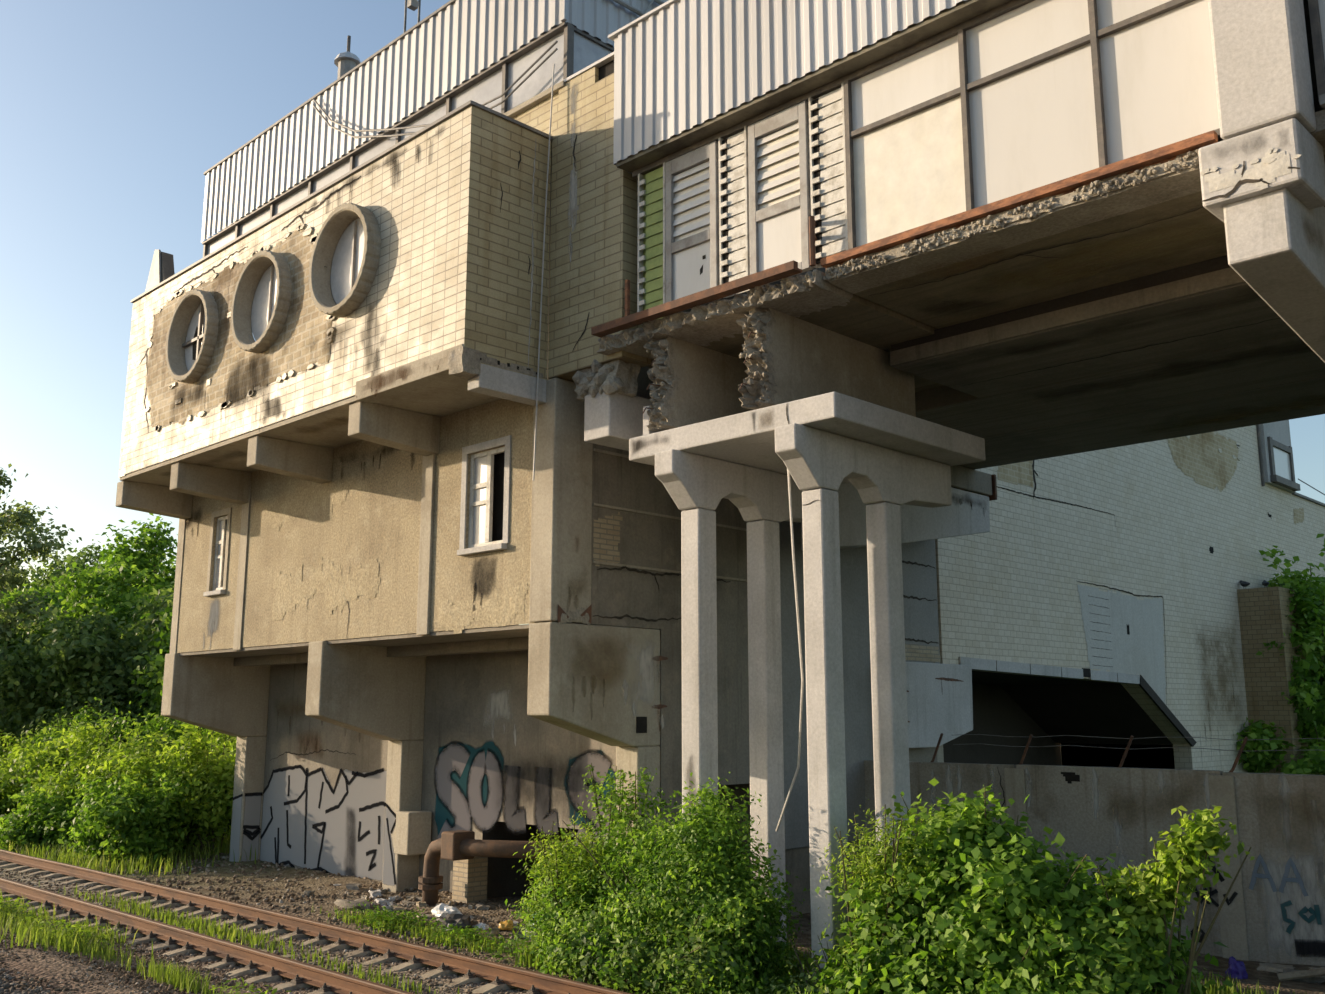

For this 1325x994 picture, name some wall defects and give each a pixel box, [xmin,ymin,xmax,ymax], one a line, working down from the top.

spalling [823,148,1302,281]
crack [869,161,1300,296]
water stain [366,307,377,370]
water stain [174,384,206,421]
water stain [221,357,279,432]
crack [997,460,1116,525]
water stain [473,562,494,620]
crack [593,566,682,622]
crack [902,560,935,601]
crack [905,637,938,645]